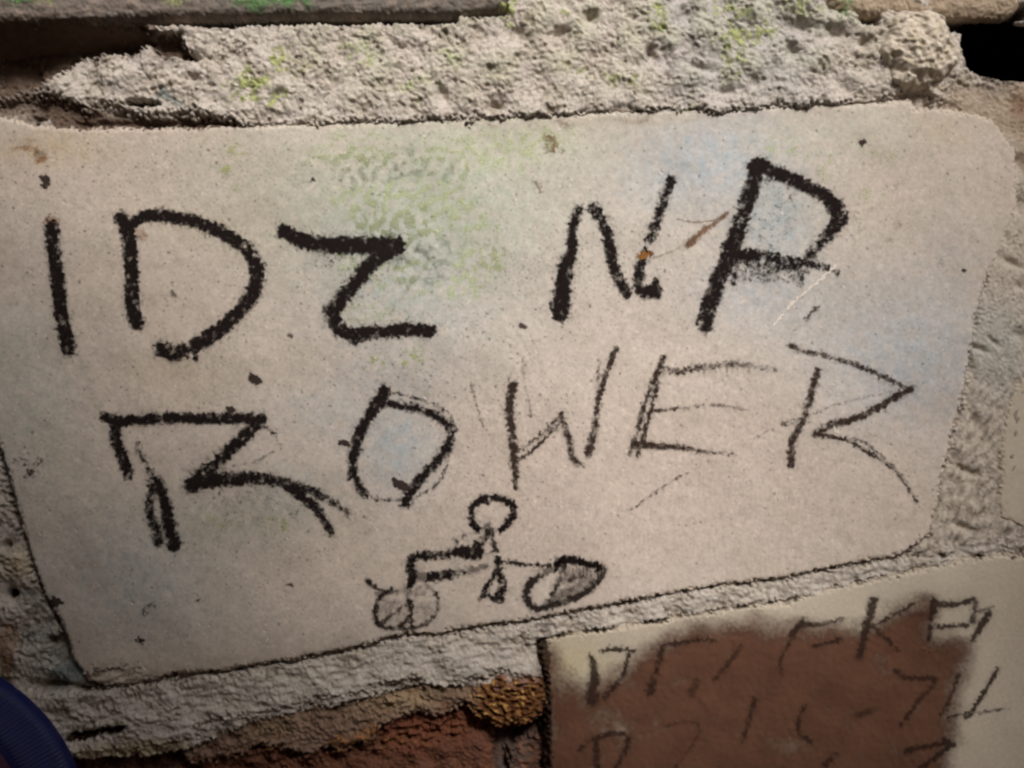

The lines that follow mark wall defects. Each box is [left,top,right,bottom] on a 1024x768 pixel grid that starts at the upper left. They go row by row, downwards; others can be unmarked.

spalling [0,13,240,133]
rust [678,212,729,248]